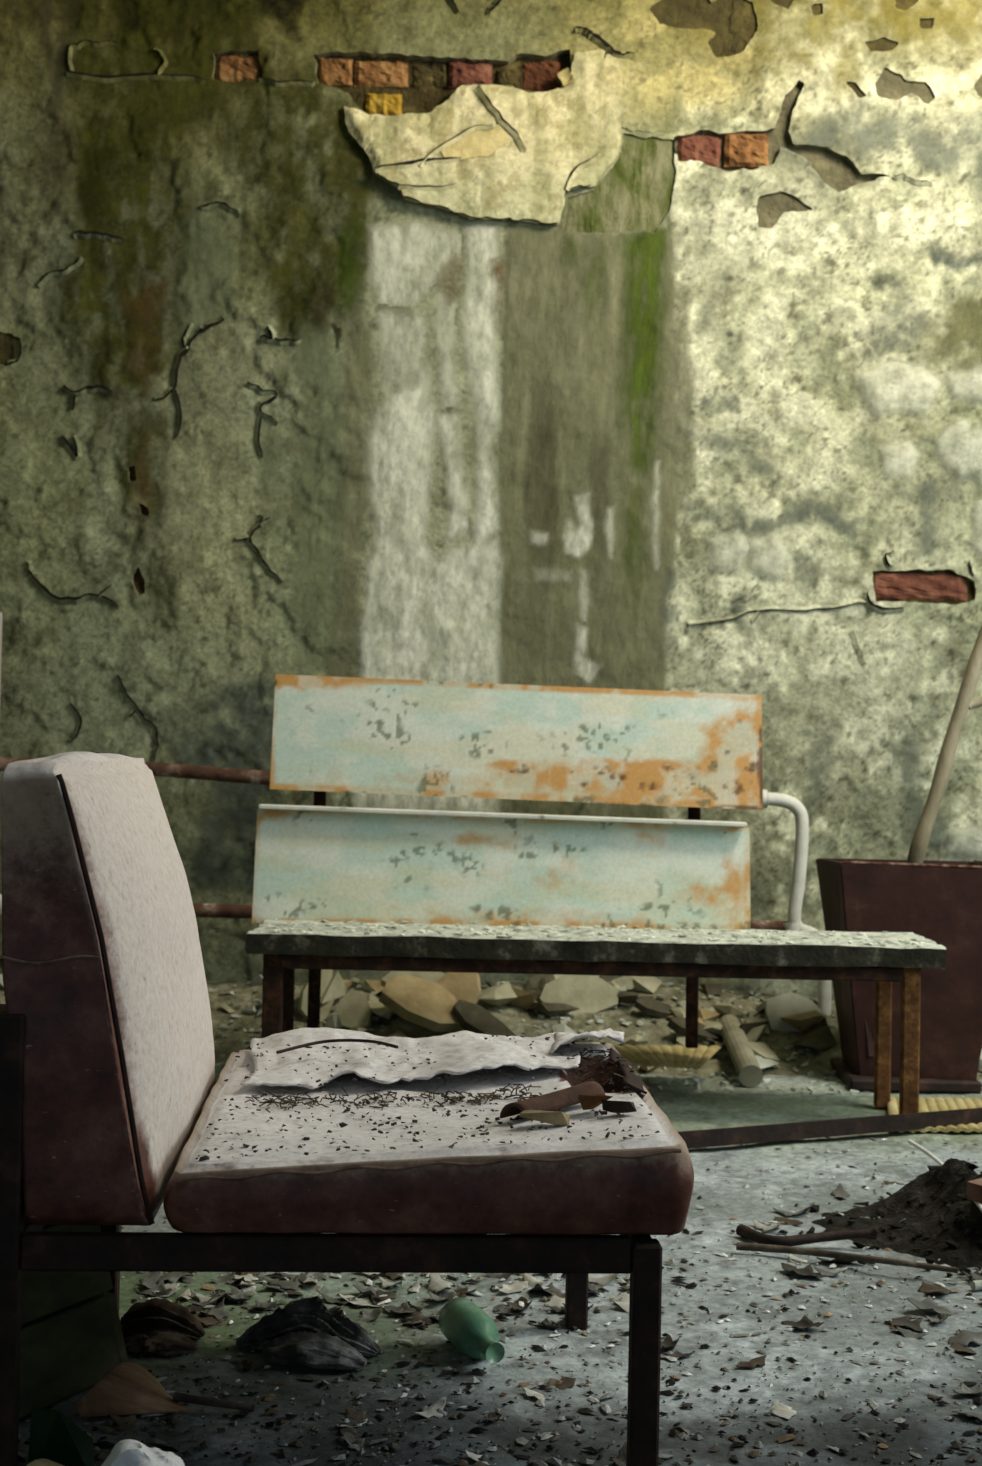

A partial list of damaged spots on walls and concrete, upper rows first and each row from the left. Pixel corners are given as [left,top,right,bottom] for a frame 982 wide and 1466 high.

water stain [259,0,303,35]
crack [575,26,635,75]
flaking render [649,0,758,58]
flaking render [895,0,934,29]
flaking render [313,48,890,234]
crack [154,316,224,437]
crack [246,381,278,459]
water stain [296,224,736,691]
water stain [735,503,856,531]
crack [236,515,283,585]
flaking render [872,569,976,605]
water stain [354,793,665,824]